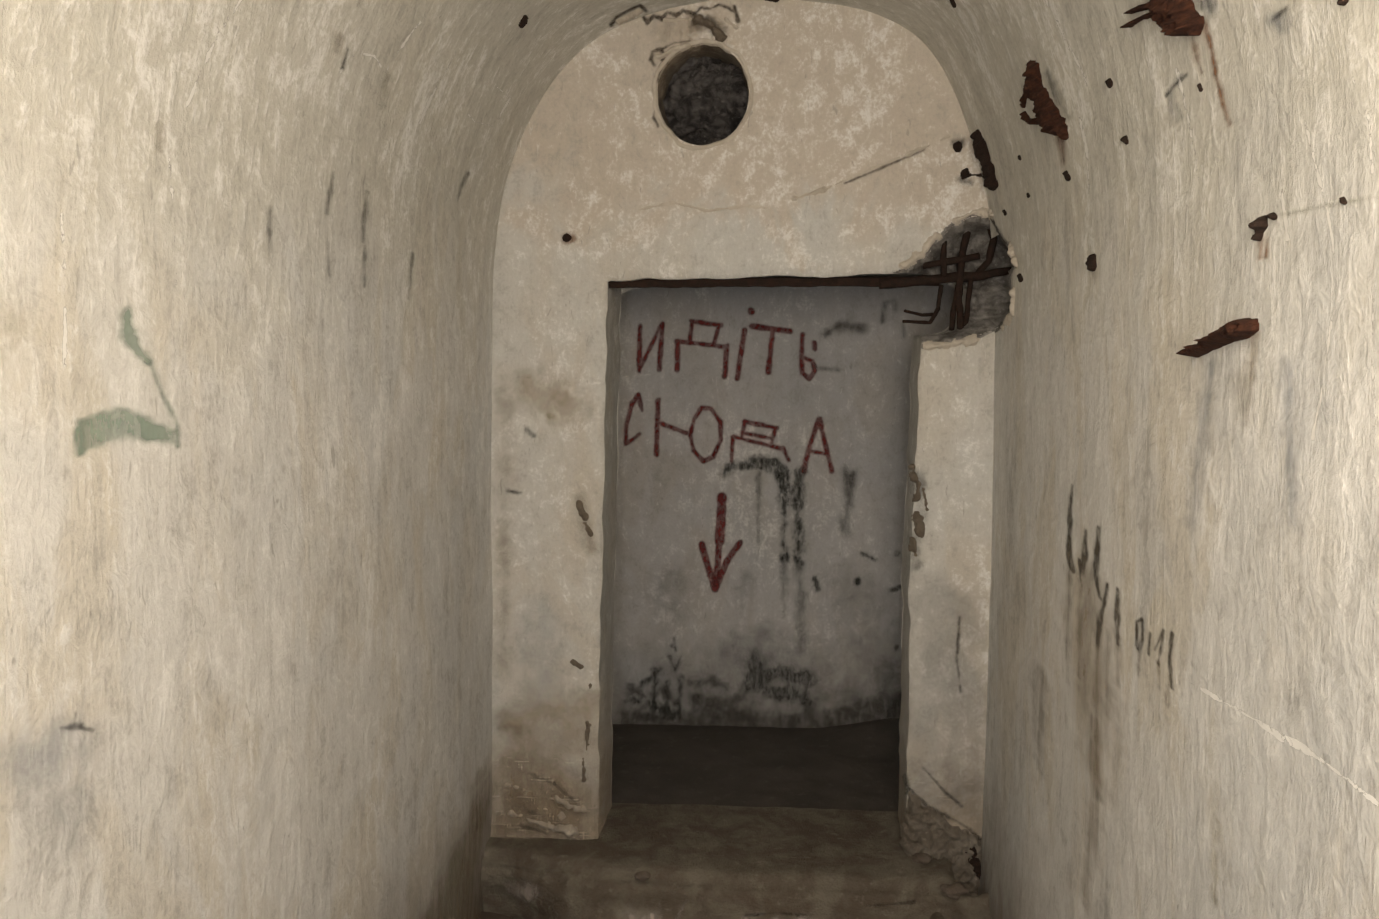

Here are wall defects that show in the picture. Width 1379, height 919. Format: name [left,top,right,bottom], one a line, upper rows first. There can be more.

rust [1120,0,1225,108]
rust [970,129,999,191]
rust [1019,60,1069,161]
spalling [879,207,1023,351]
rust [1176,318,1259,358]
water stain [723,458,804,565]
water stain [621,646,900,728]
crack [1200,687,1379,807]